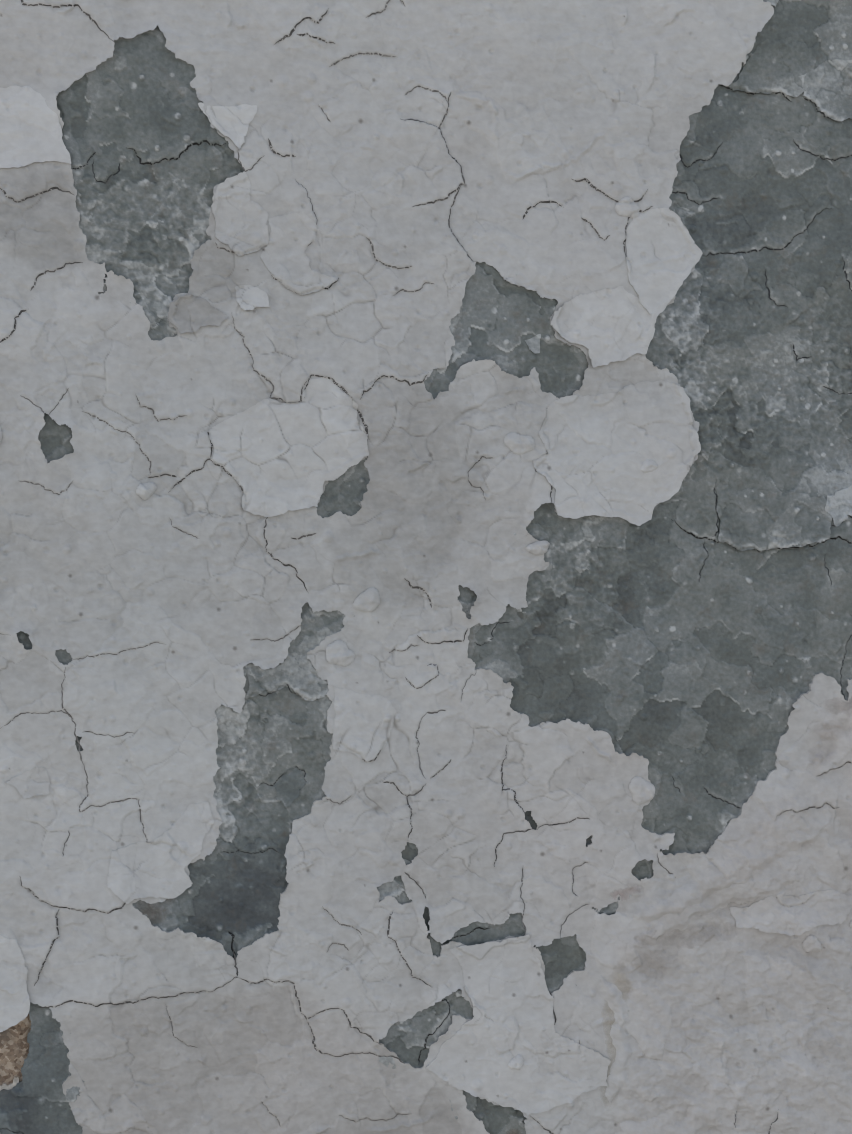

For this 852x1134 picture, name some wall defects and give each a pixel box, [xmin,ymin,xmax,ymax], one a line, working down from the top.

peeling [0,26,338,341]
crack [401,86,472,260]
crack [20,388,243,492]
peeling [209,376,370,518]
crack [232,316,429,458]
peeling [424,0,852,881]
crack [0,642,163,856]
peeling [107,602,397,959]
crack [364,629,476,838]
peeling [0,935,85,1134]
crack [20,877,405,1064]
peeling [377,842,611,1134]